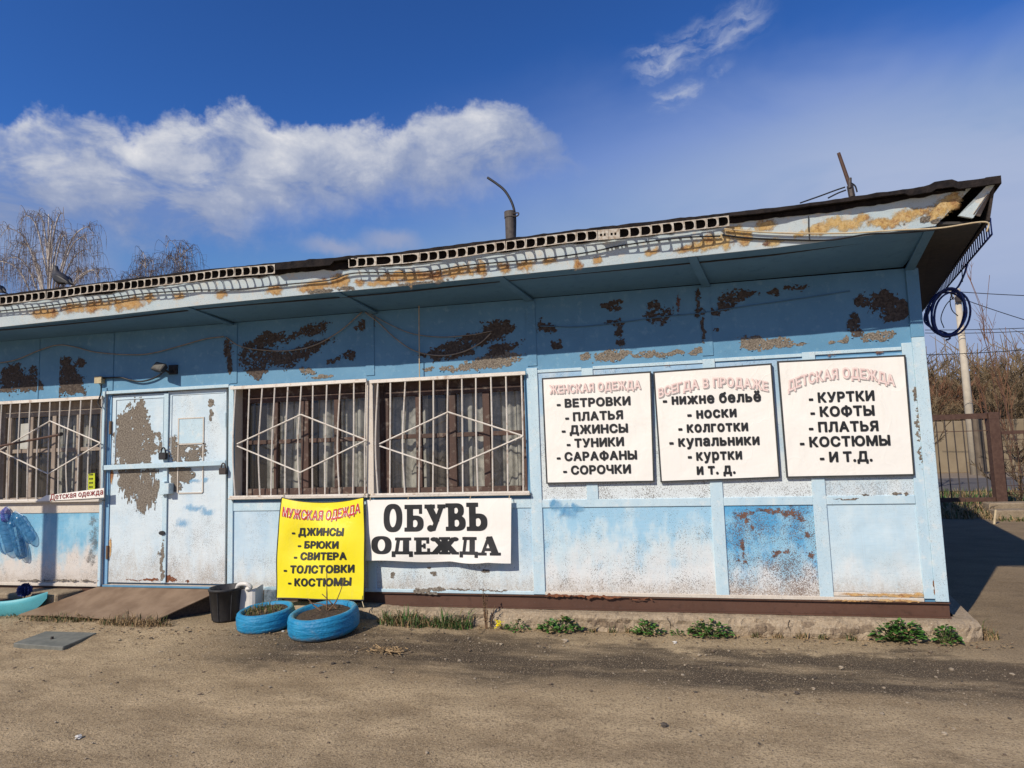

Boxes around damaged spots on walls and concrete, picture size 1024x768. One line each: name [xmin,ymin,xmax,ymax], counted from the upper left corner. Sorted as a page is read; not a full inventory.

peeling [0,362,43,397]
peeling [58,356,88,398]
peeling [223,320,356,381]
peeling [418,319,526,373]
peeling [580,284,810,364]
peeling [828,289,909,344]
peeling [111,397,208,514]
rust [733,505,811,538]